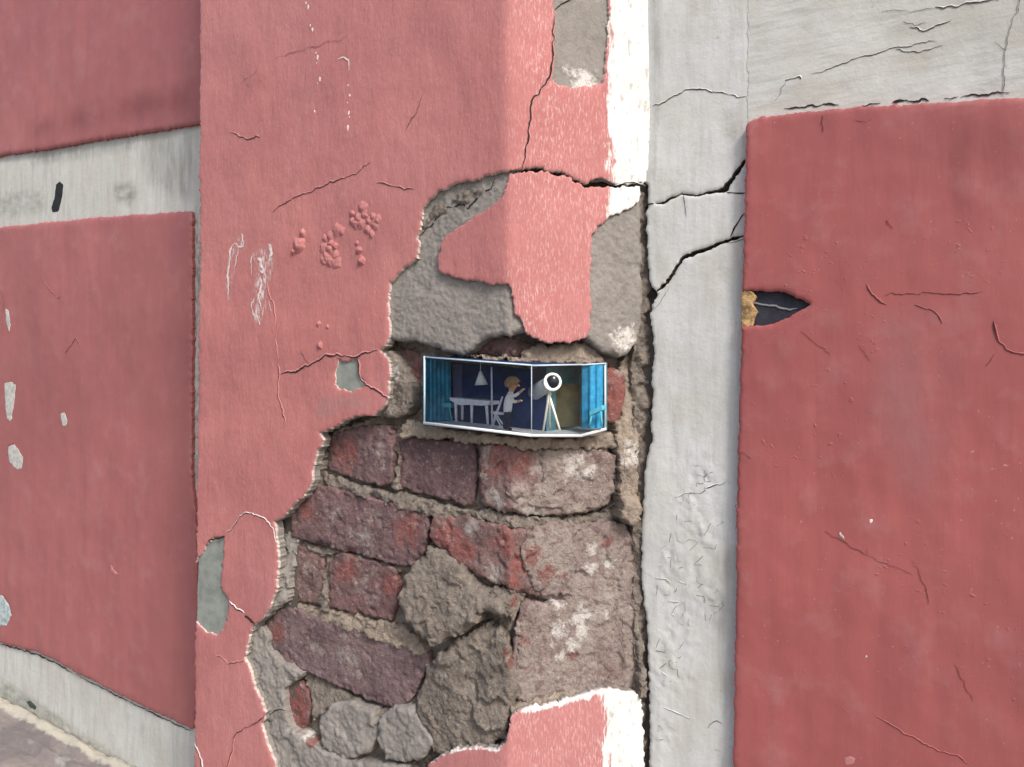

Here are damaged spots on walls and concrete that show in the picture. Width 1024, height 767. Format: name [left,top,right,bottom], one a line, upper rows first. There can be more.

peeling [550,0,608,89]
crack [776,0,1020,131]
crack [274,162,414,211]
crack [421,0,748,307]
damp [227,233,273,325]
peeling [741,290,810,327]
peeling [4,382,16,421]
peeling [7,443,23,470]
flaking render [250,172,653,767]
peeling [197,537,229,635]
crack [824,531,929,603]